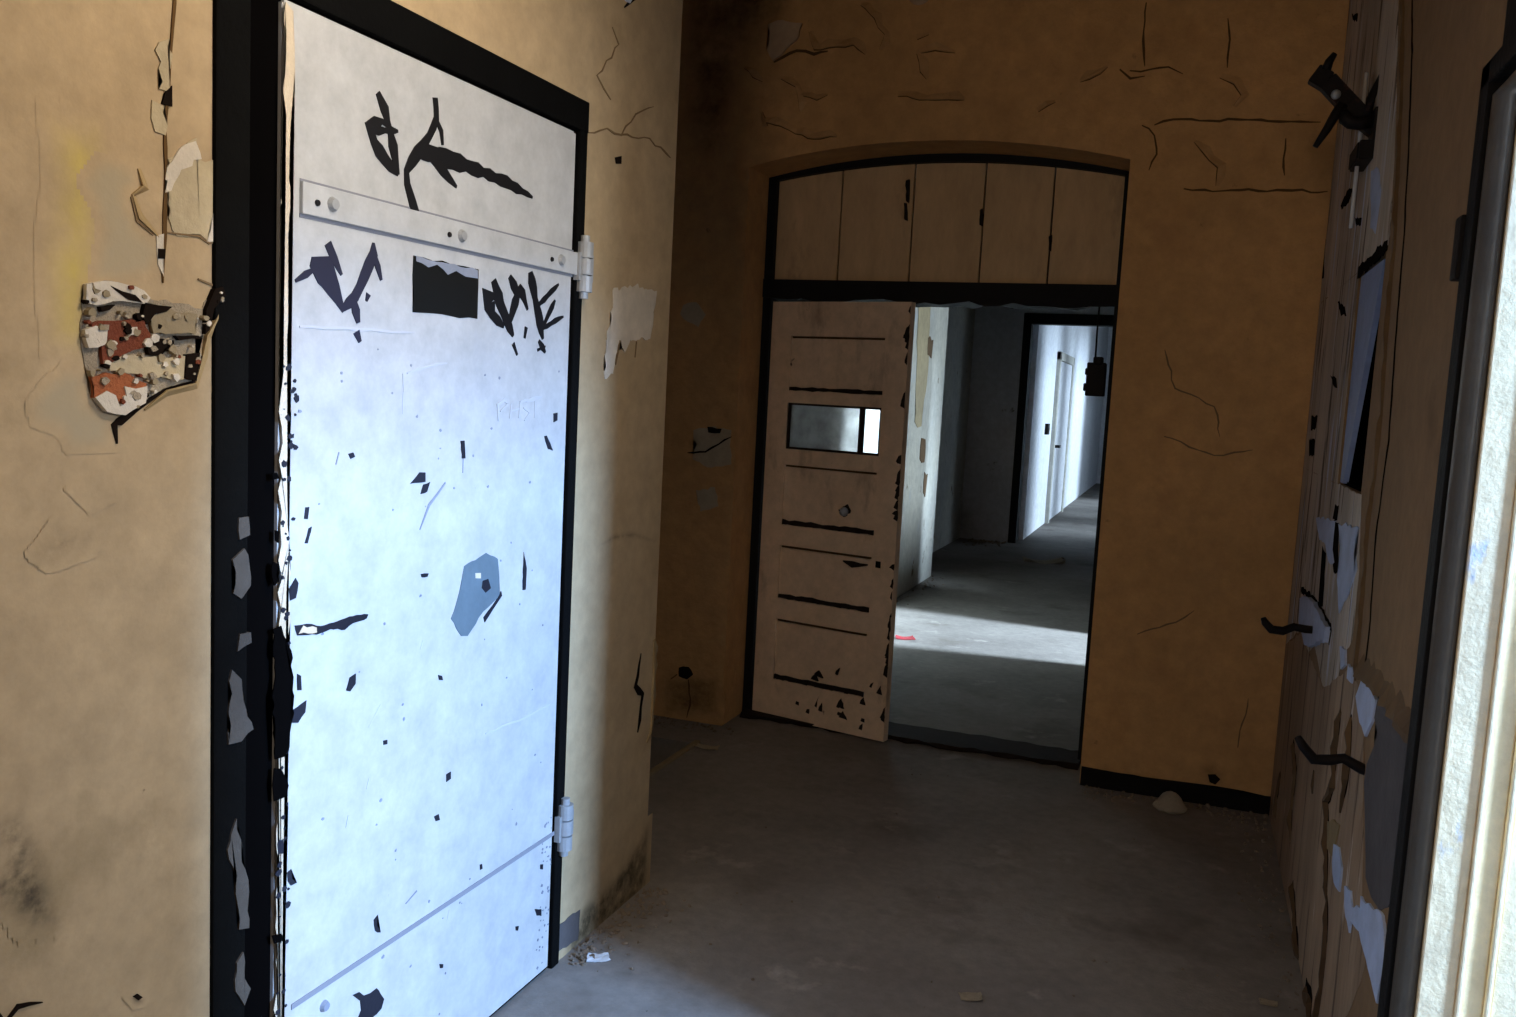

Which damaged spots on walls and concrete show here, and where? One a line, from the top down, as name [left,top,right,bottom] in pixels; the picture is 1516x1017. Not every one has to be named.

crack [1120,2,1183,80]
crack [1225,18,1233,68]
crack [1142,118,1328,193]
flaking render [25,138,226,455]
peeling [603,284,657,379]
peeling [1269,0,1413,1017]